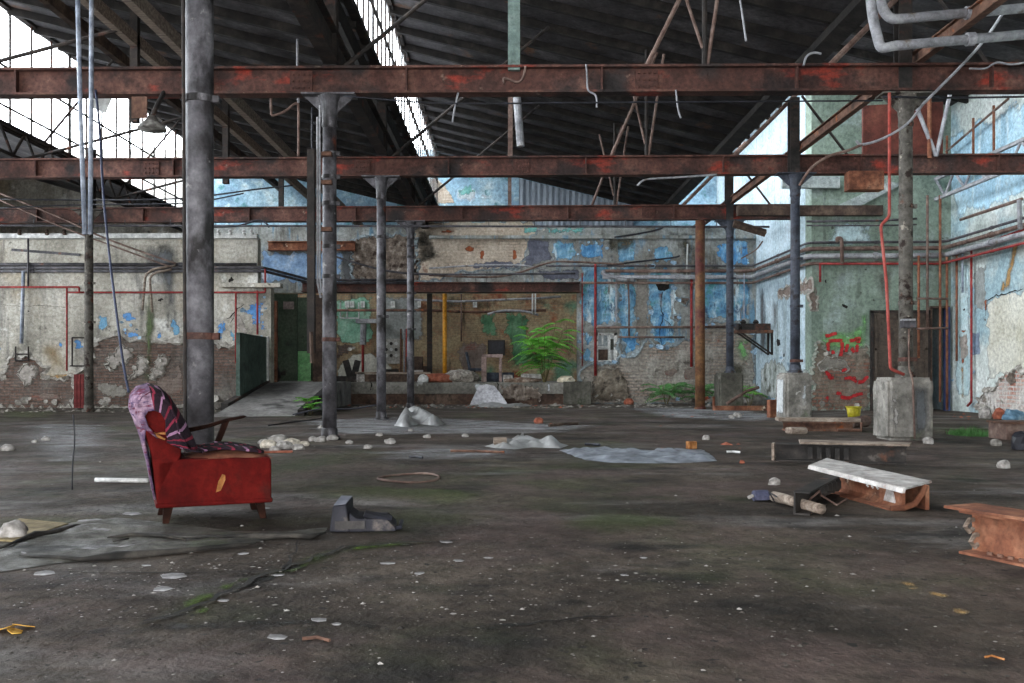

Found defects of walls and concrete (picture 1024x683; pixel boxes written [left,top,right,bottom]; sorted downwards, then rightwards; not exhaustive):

spalling [0,312,183,408]
water stain [140,293,153,363]
water stain [147,247,174,303]
spalling [214,296,267,408]
peeling [261,250,307,283]
spalling [337,221,788,404]
peeling [951,265,1024,414]